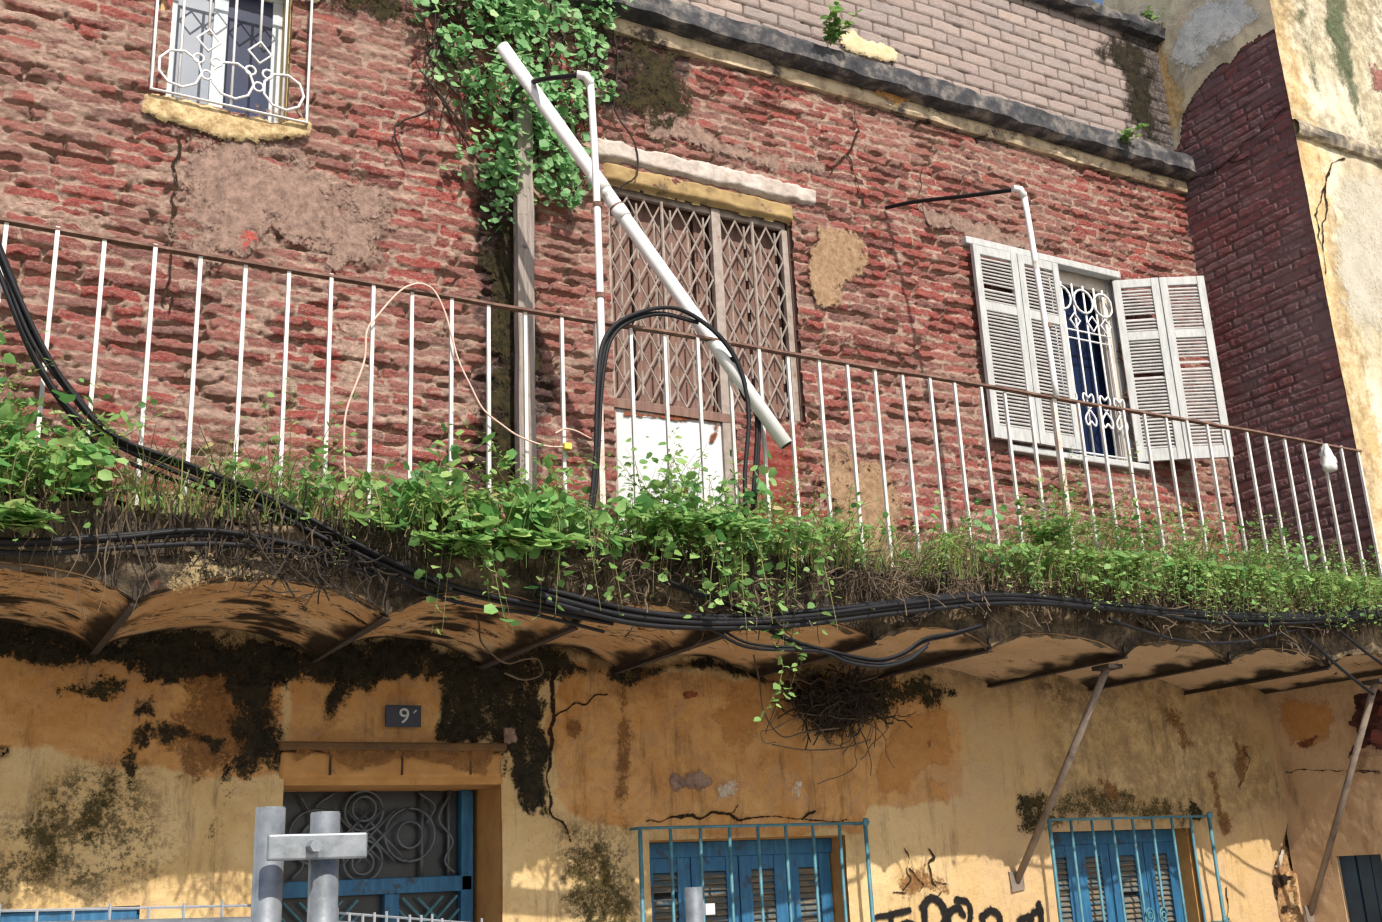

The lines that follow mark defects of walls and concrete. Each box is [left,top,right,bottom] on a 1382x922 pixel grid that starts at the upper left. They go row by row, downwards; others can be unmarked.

water stain [610,36,702,132]
water stain [1094,11,1164,143]
water stain [1326,3,1353,76]
crack [161,134,182,310]
crack [1315,157,1345,273]
flaking render [1158,29,1382,604]
water stain [0,621,509,805]
spalling [1348,690,1382,769]
crack [646,805,847,822]
spalling [1272,824,1300,922]